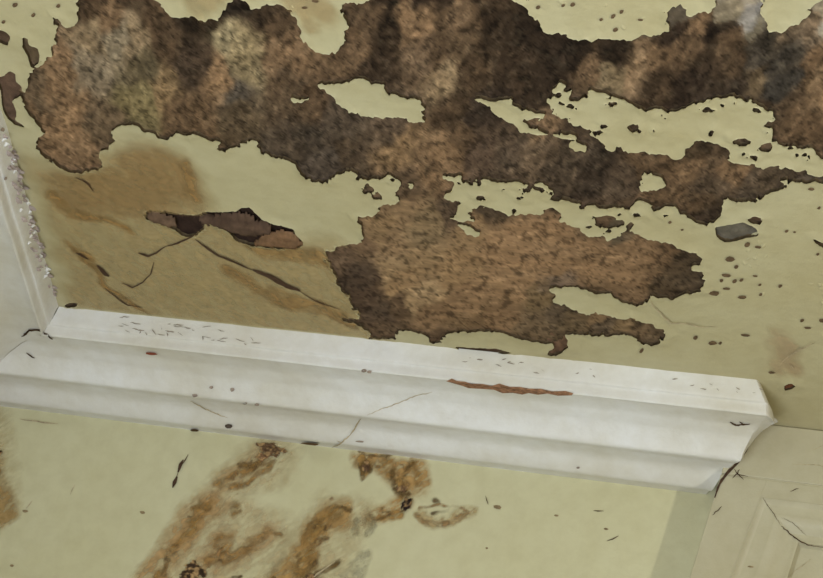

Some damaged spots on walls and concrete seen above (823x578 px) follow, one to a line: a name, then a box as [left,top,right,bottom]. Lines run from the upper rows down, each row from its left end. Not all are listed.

peeling [0,0,823,353]
crack [76,234,340,345]
crack [332,392,431,448]
corrosion [447,379,573,396]
water stain [0,486,17,525]
water stain [140,443,287,578]
water stain [270,451,476,578]